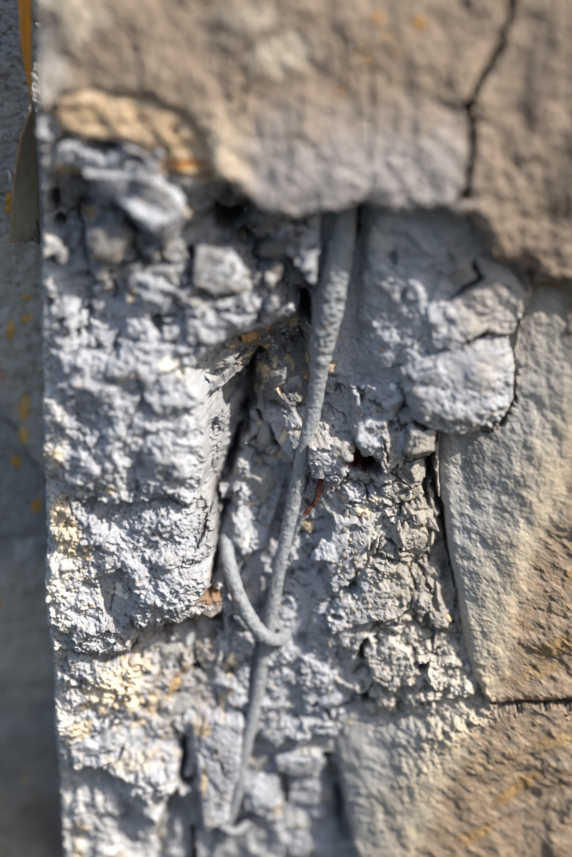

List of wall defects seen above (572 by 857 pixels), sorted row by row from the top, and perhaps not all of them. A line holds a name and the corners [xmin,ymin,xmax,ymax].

crack [442,0,517,208]
spalling [37,90,482,857]
crack [214,747,231,781]
crack [156,787,177,843]
crack [190,824,198,857]